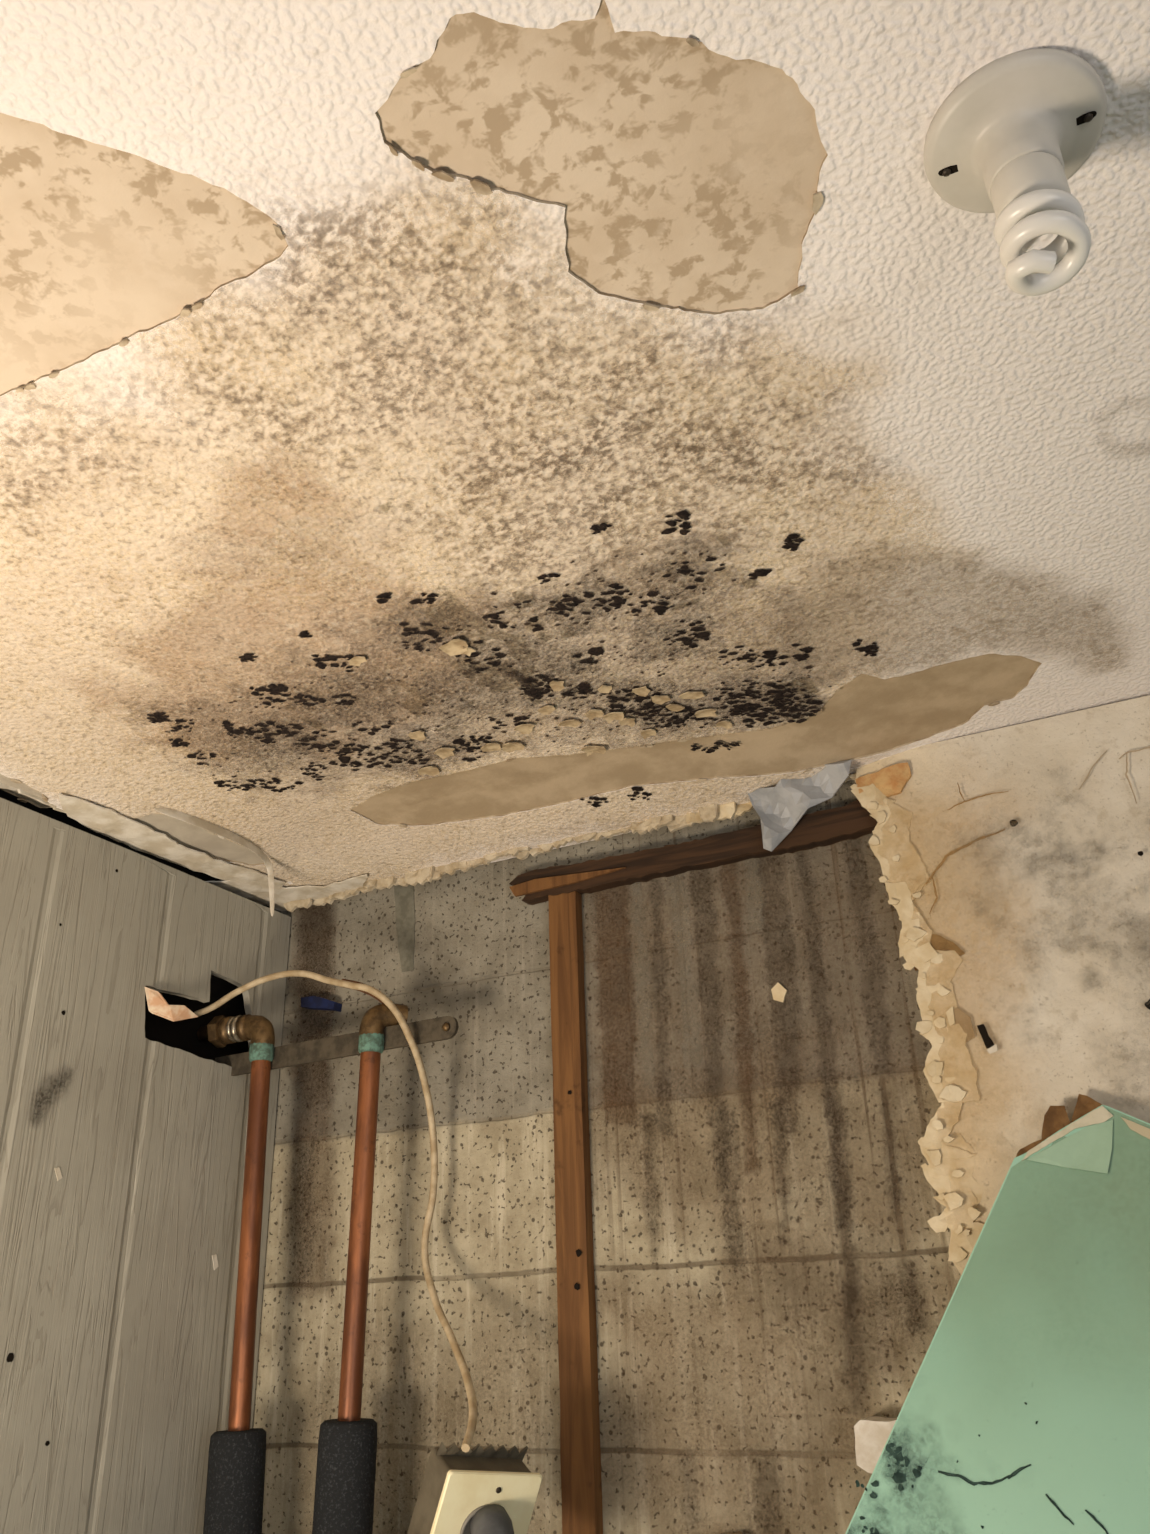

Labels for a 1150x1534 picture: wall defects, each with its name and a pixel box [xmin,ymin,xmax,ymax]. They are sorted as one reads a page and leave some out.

peeling [0,113,288,395]
peeling [376,0,827,312]
water stain [0,199,1118,887]
peeling [0,774,754,916]
peeling [352,654,1040,1263]